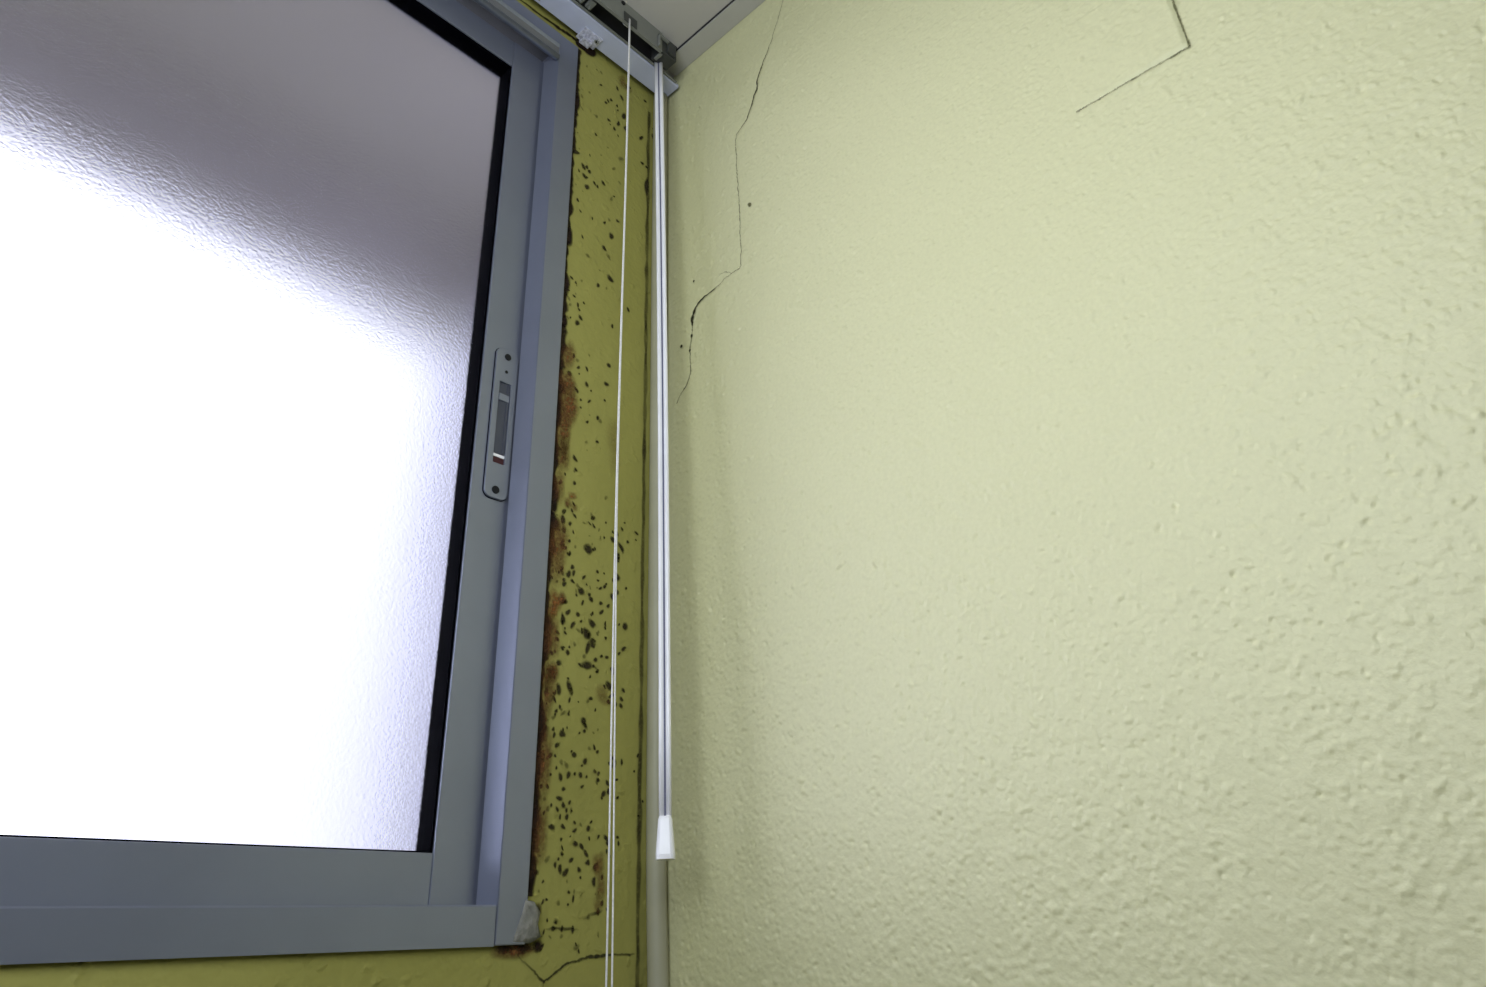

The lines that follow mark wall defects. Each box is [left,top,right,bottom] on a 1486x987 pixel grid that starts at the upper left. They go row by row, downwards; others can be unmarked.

water stain [573,150,619,251]
water stain [595,84,653,241]
crack [677,6,782,402]
water stain [561,354,611,424]
water stain [536,427,646,953]